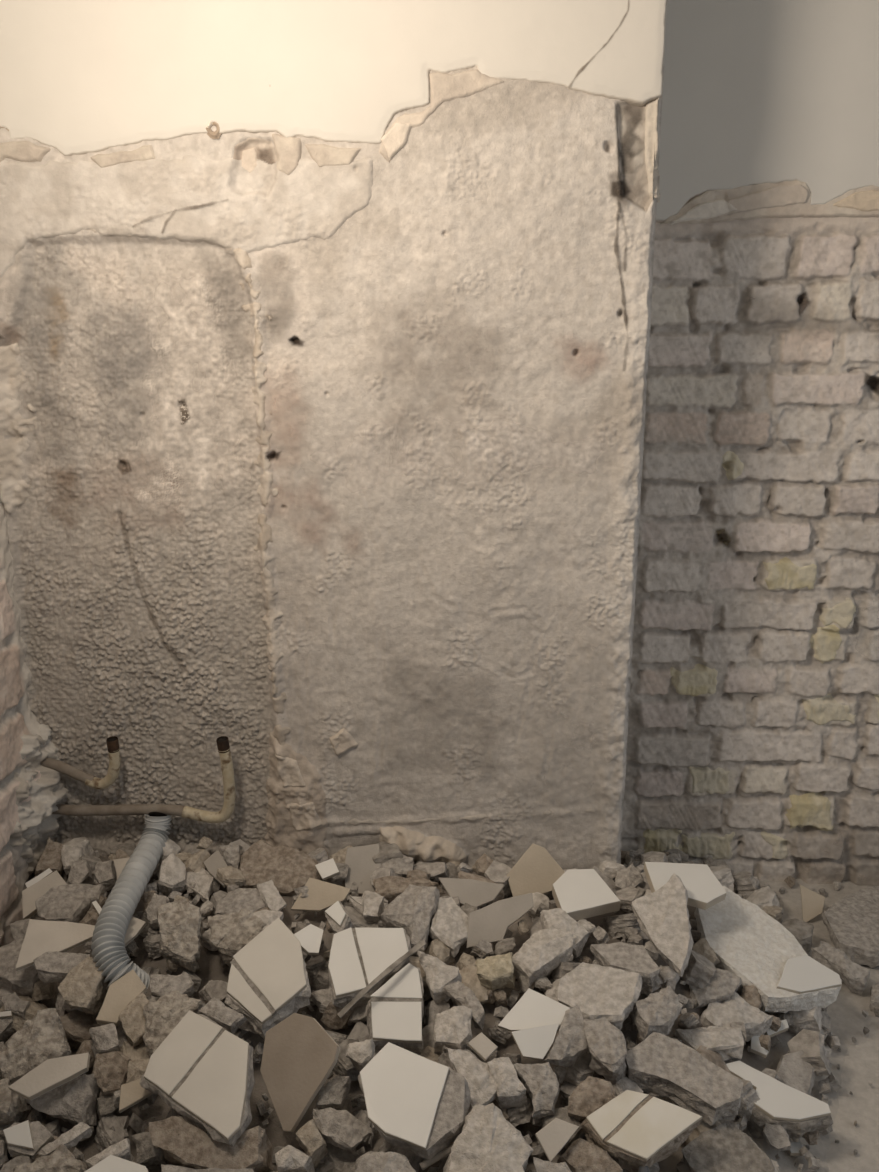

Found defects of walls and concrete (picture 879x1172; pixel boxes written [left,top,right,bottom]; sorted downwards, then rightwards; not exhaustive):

crack [569,2,629,87]
spalling [0,69,504,277]
spalling [616,98,660,212]
peeling [660,181,879,225]
spalling [763,557,817,590]
spalling [809,598,856,664]
spalling [670,664,718,697]
spalling [802,693,856,725]
spalling [688,766,730,794]
spalling [265,728,381,955]
spalling [643,829,735,910]
spalling [761,792,834,859]